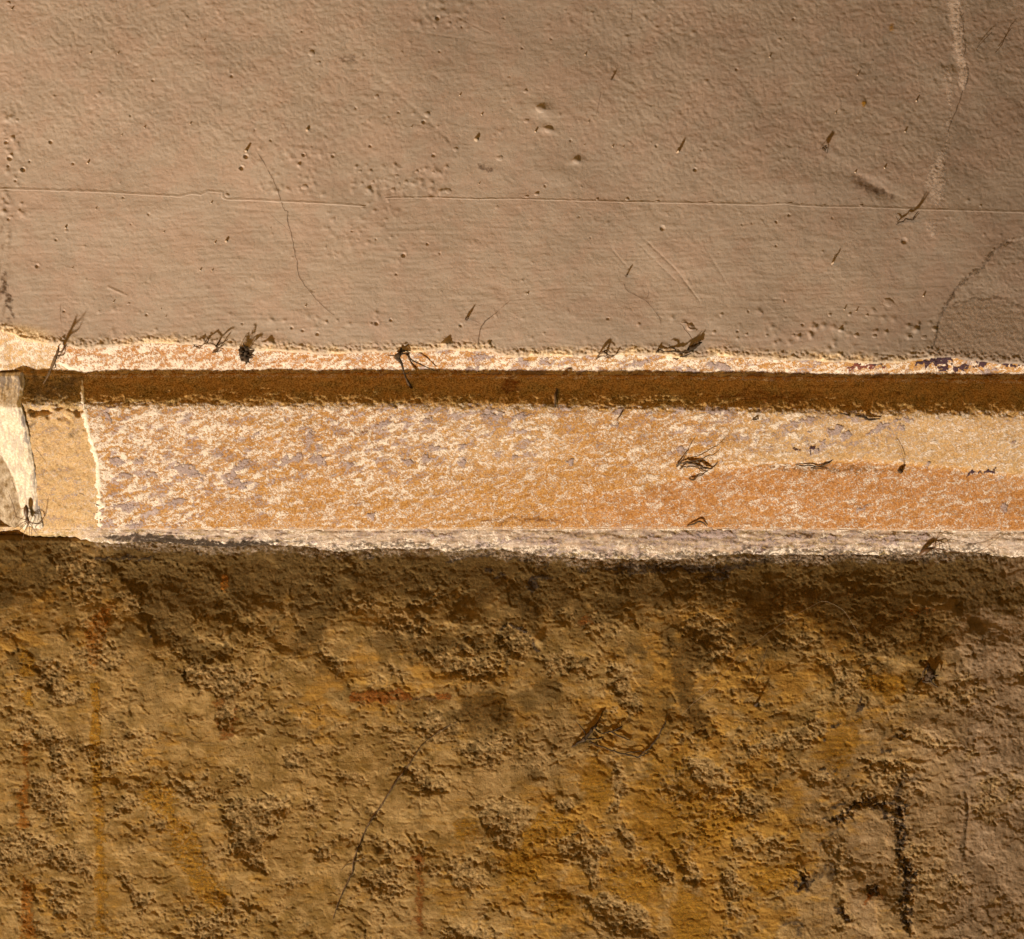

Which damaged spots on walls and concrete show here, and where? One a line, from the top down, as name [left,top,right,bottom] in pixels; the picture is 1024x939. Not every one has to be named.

crack [259,155,332,314]